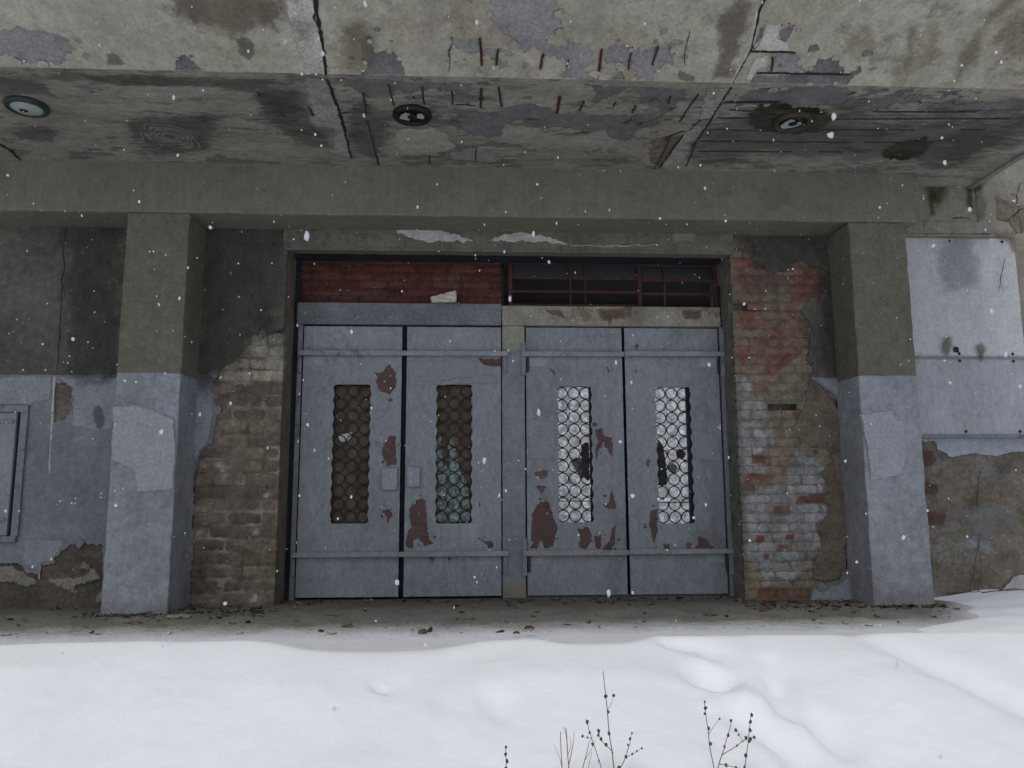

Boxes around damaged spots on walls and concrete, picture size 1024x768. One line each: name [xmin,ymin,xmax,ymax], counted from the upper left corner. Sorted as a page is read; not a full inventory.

peeling [0,25,92,68]
leakage [178,0,281,35]
peeling [342,0,703,168]
peeling [727,23,923,111]
peeling [396,230,473,243]
peeling [487,232,567,245]
flaking render [728,245,847,601]
flaking render [189,329,286,607]
flaking render [922,441,1024,597]
flaking render [0,538,104,609]